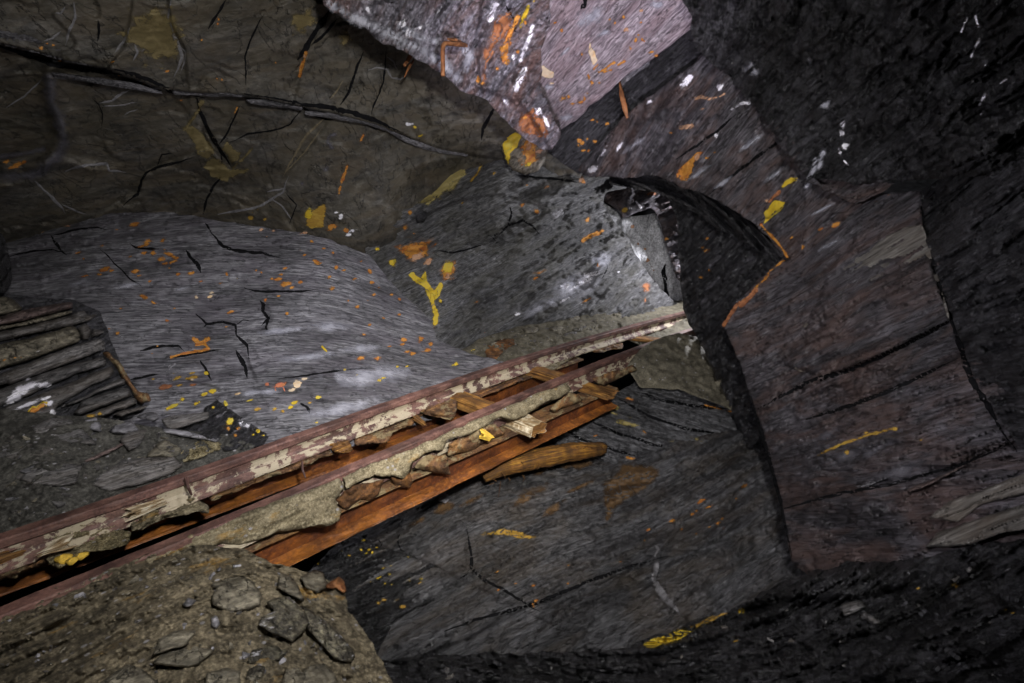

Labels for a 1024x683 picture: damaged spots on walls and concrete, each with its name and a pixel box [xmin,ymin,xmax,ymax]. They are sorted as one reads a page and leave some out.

crack [0,9,414,258]
crack [131,287,317,381]